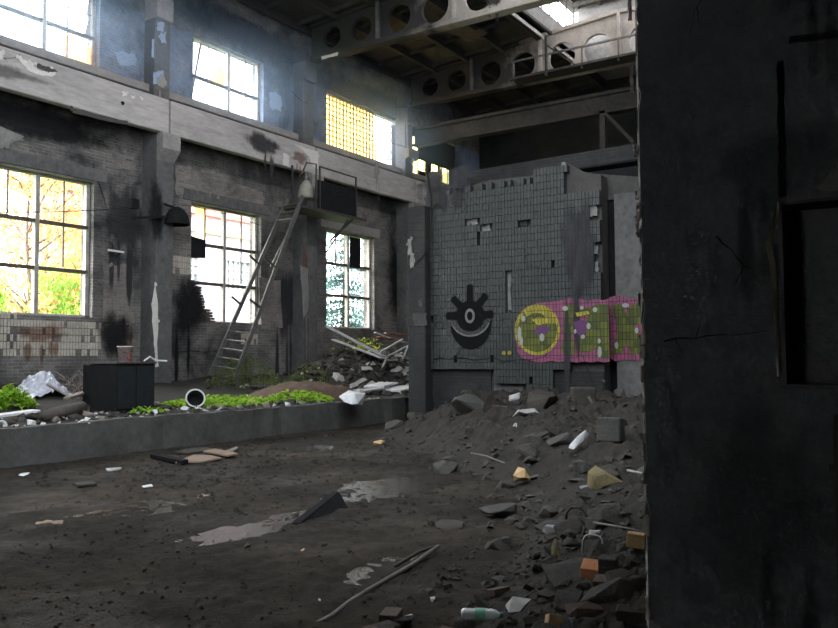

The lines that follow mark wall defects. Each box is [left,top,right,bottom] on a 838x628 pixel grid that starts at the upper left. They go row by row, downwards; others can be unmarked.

peeling [16,55,58,77]
leakage [249,133,279,181]